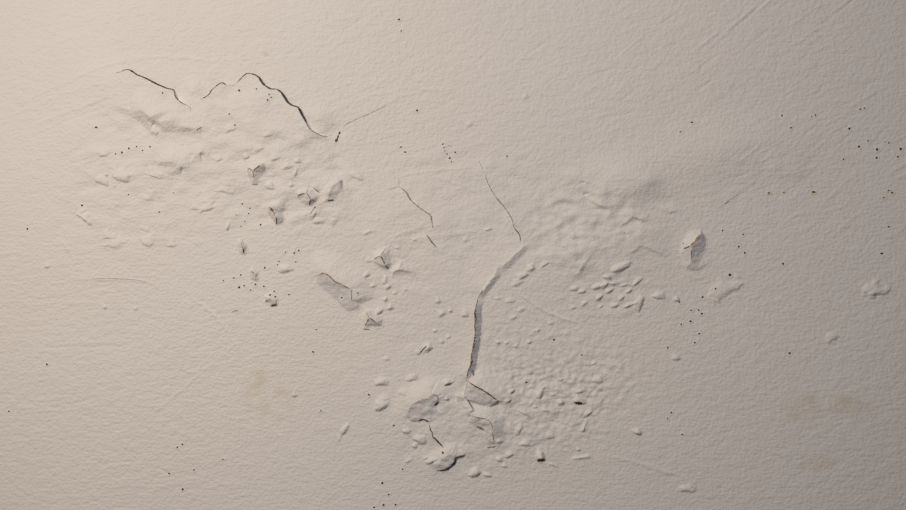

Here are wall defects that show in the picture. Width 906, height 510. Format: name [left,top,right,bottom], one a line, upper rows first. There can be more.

crack [115,68,391,142]
crack [390,185,436,247]
crack [479,162,521,242]
peeling [678,228,708,271]
spalling [314,272,385,331]
crack [462,291,484,384]
spalling [406,392,446,423]
crack [425,422,446,454]
peeling [436,453,464,472]
spalling [455,380,500,449]